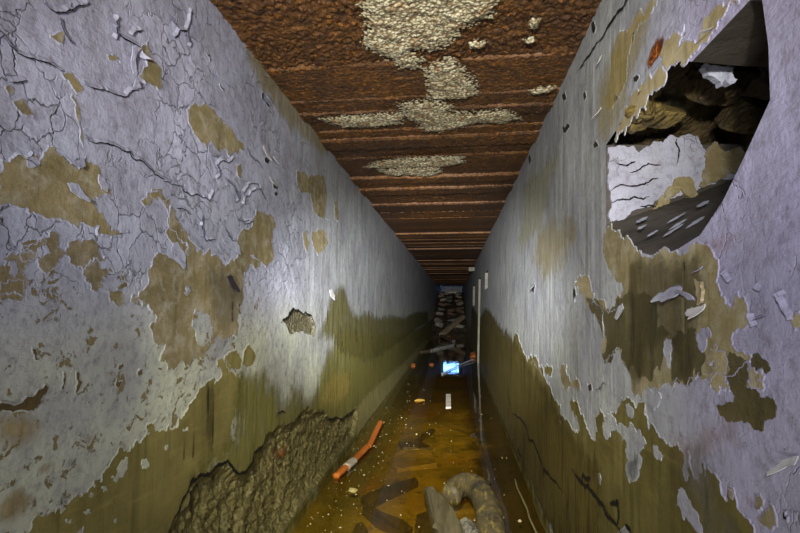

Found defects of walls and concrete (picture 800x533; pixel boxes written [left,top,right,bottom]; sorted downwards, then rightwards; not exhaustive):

crack [3,34,63,83]
crack [112,14,142,48]
crack [170,8,192,47]
crack [579,0,627,69]
rust [647,37,664,68]
peeling [0,71,276,371]
crack [85,134,265,242]
peeling [506,0,790,533]
spalling [281,308,315,338]
peeling [26,344,358,533]
water stain [194,288,433,533]
water stain [470,308,599,533]